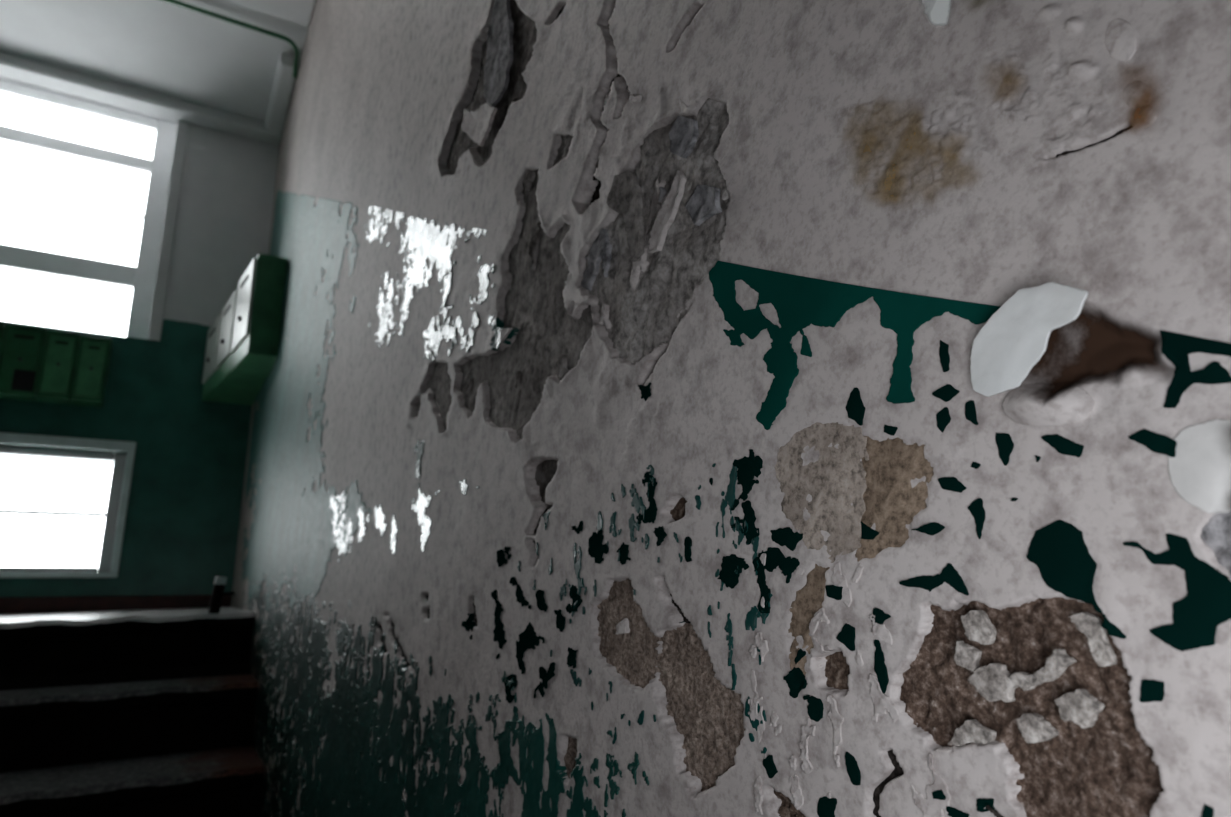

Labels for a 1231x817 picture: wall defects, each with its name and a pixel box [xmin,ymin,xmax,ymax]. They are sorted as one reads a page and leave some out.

spalling [447,0,537,175]
peeling [1160,330,1231,408]
spalling [242,98,1165,817]
peeling [1128,429,1177,457]
peeling [1123,512,1231,651]
peeling [1202,804,1214,817]